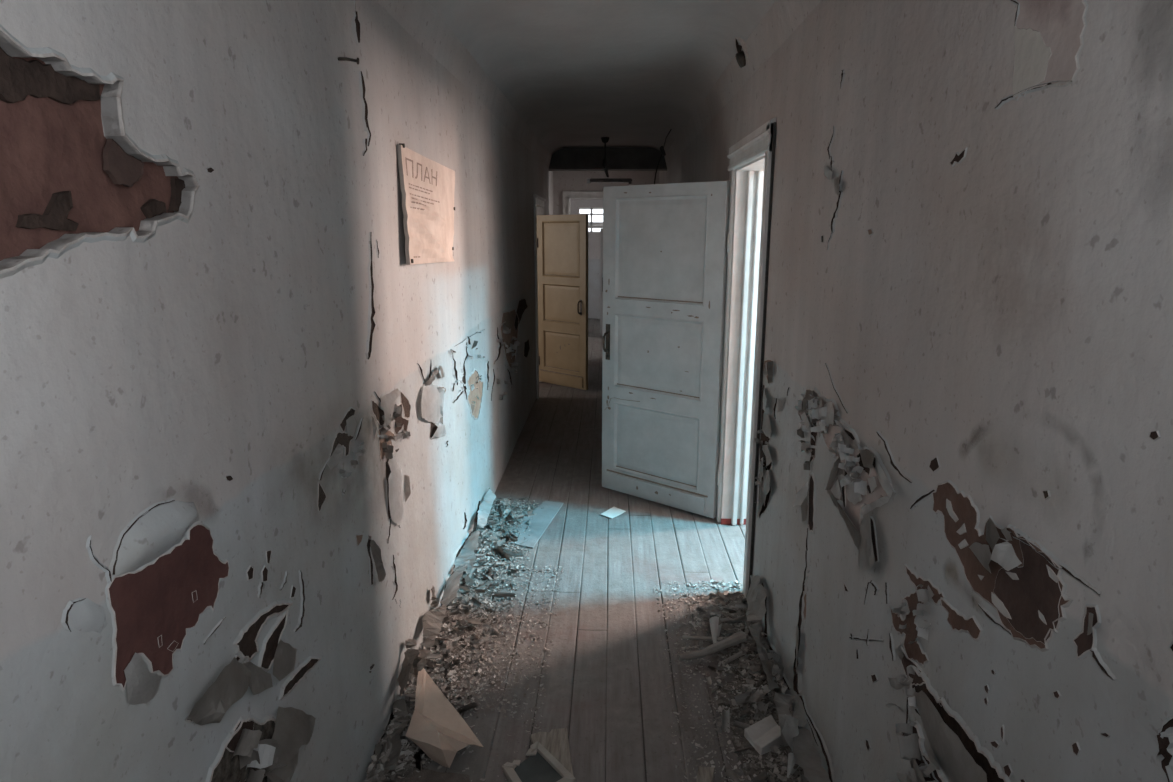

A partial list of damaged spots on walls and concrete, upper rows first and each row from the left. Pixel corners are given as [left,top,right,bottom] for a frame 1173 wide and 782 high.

flaking render [0,24,214,279]
peeling [317,298,530,586]
peeling [754,359,897,604]
peeling [105,522,230,705]
peeling [184,550,322,782]
peeling [871,456,1116,782]
crack [1157,714,1173,782]